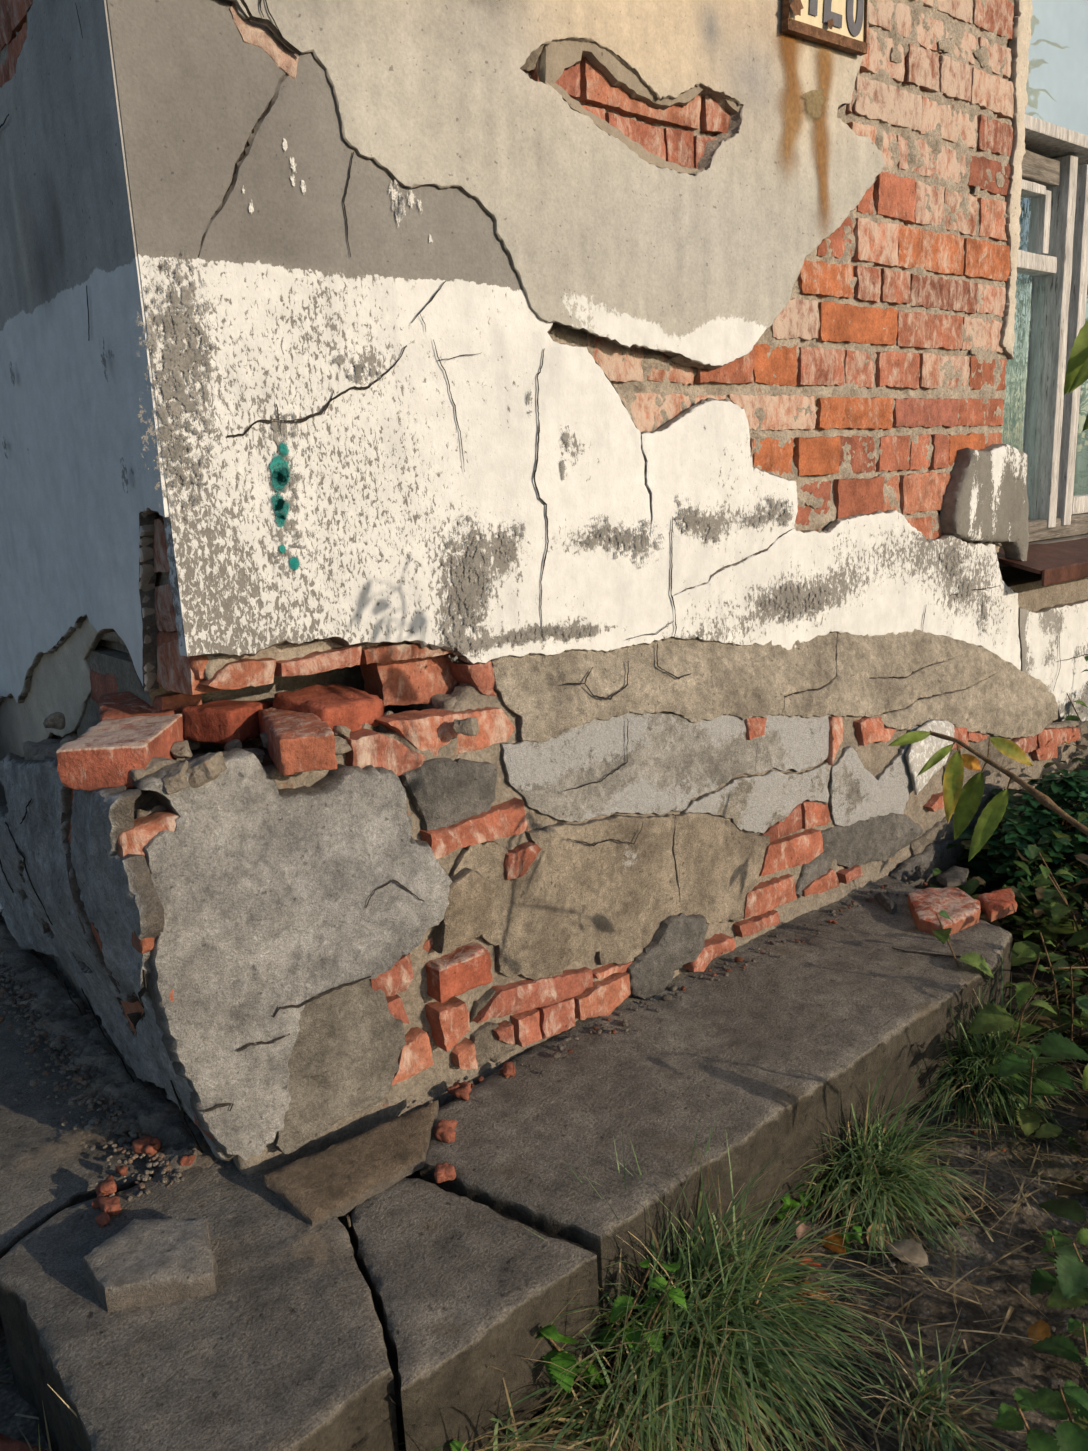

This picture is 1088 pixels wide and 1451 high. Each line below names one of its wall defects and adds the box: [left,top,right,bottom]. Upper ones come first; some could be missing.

crack [343,152,354,257]
flaking render [609,50,681,100]
flaking render [680,85,743,174]
rust [790,0,804,16]
rust [781,33,832,218]
crack [227,281,482,471]
crack [533,348,549,635]
flaking render [936,443,1029,636]
crack [562,518,692,792]
flaking render [905,720,955,795]
spalling [908,887,1018,935]
crack [348,1227,402,1406]